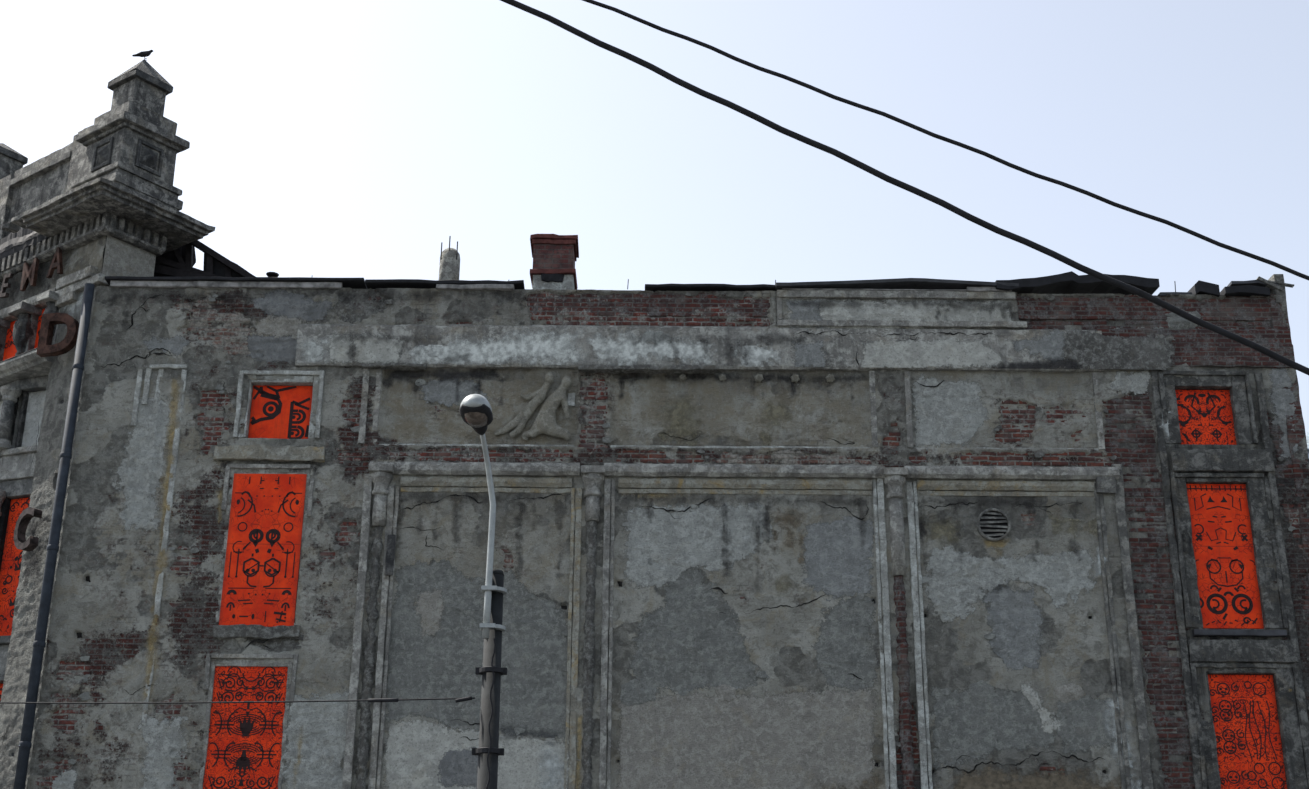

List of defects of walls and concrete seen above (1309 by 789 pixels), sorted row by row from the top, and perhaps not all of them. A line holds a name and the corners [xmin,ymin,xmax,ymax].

flaking render [142,294,251,364]
flaking render [527,291,773,327]
spalling [1012,295,1272,371]
flaking render [196,384,231,455]
flaking render [1267,413,1309,550]
flaking render [48,655,92,734]
flaking render [169,545,202,575]
flaking render [385,558,486,732]
flaking render [499,548,571,740]
flaking render [629,565,769,696]
flaking render [811,593,879,696]
flaking render [959,392,1195,789]